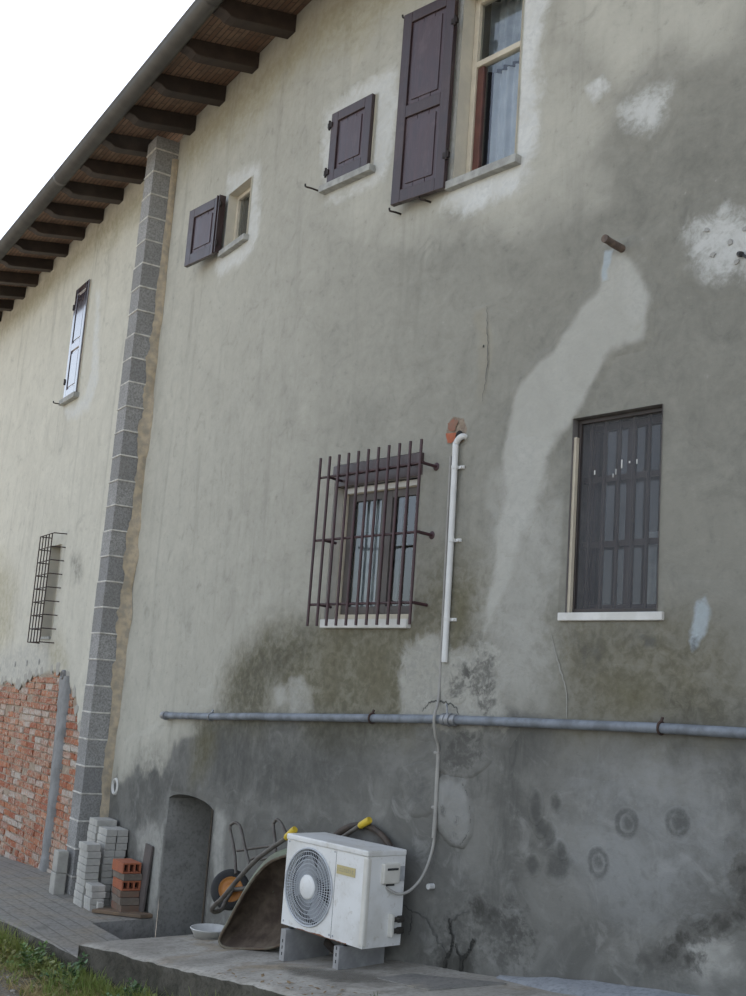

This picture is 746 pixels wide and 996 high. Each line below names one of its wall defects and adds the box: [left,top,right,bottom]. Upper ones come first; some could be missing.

flaking render [0,630,81,873]
leakage [115,435,746,977]
peeling [686,593,713,656]
crack [403,905,475,972]